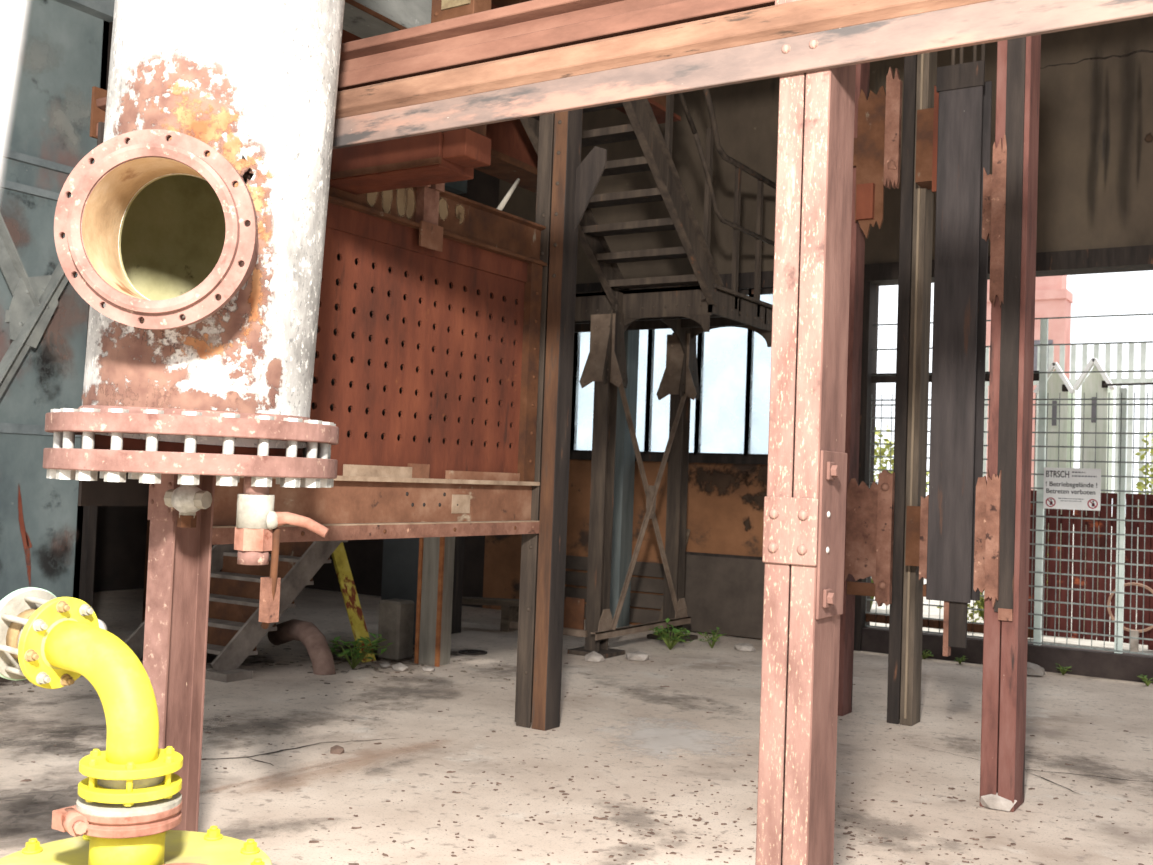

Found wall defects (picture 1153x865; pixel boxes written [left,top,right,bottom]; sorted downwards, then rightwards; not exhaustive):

rust [81,54,283,414]